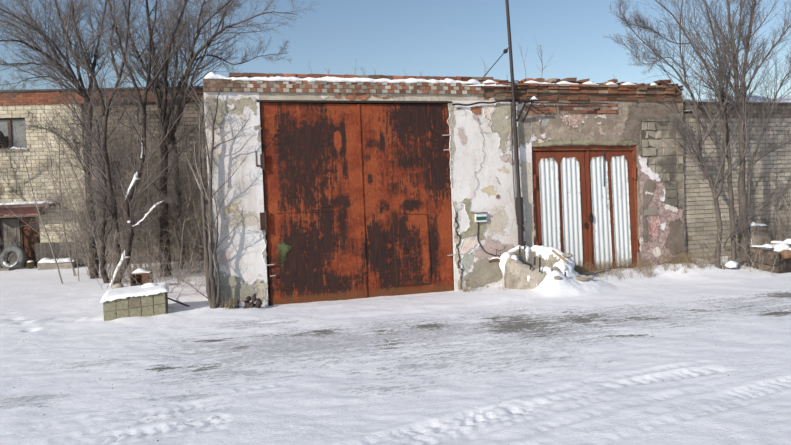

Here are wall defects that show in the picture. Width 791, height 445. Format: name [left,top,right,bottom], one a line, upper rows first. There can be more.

peeling [214,96,258,134]
spalling [447,103,456,187]
spalling [452,198,502,290]
crack [454,108,515,290]
peeling [470,102,618,168]
peeling [637,111,686,267]